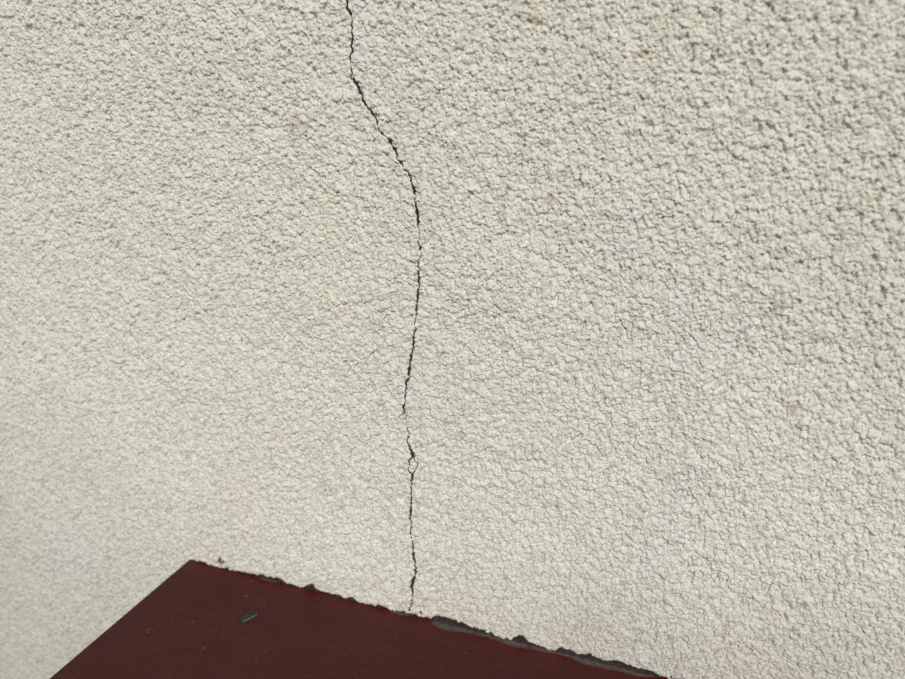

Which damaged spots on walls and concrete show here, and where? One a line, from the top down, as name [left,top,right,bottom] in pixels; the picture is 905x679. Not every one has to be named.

crack [346,0,421,612]